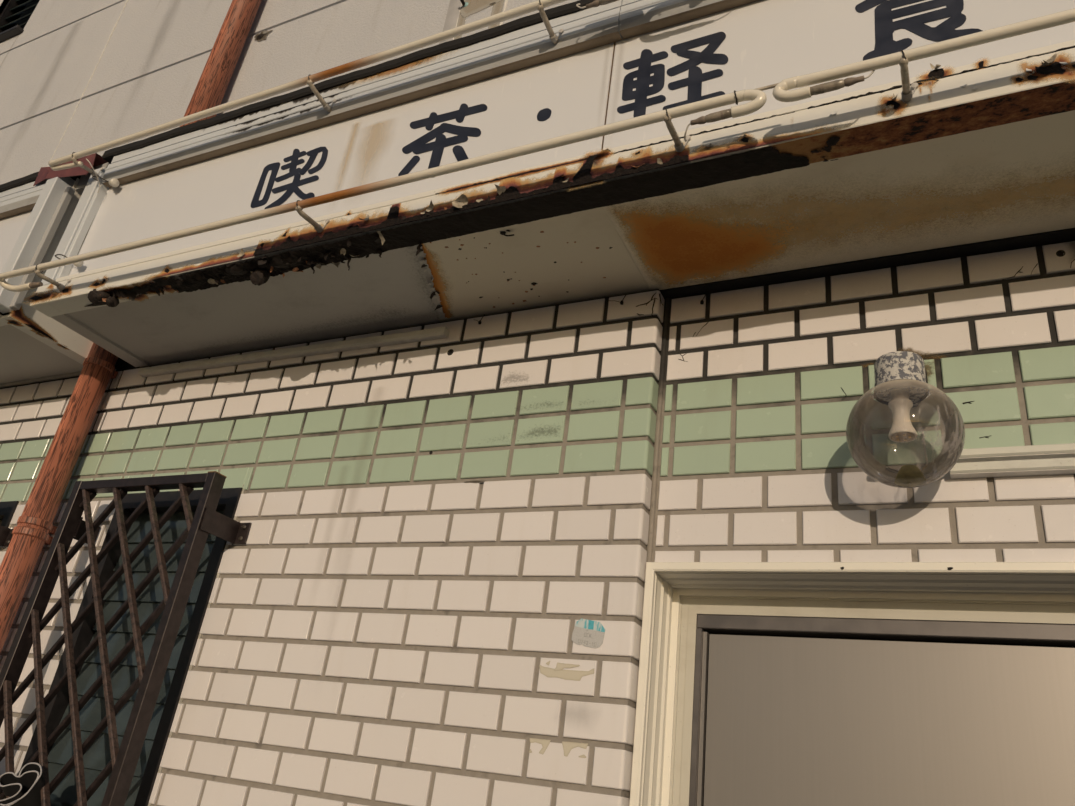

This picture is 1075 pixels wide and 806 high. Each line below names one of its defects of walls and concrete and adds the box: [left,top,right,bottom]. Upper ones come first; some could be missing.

rust [7,284,72,350]
rust [84,54,1075,318]